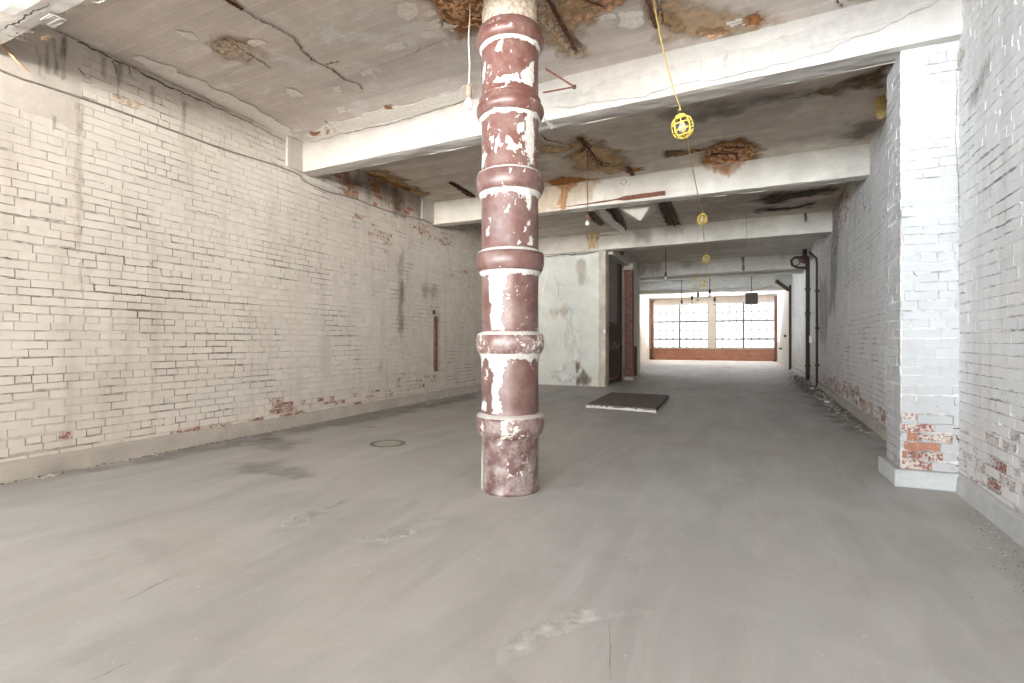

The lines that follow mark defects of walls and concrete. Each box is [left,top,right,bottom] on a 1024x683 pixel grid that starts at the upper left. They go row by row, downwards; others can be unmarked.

crack [0,4,49,31]
crack [58,32,464,144]
crack [242,9,451,90]
spalling [397,0,484,39]
peeling [537,0,937,108]
flaking render [330,171,450,246]
rust [540,136,644,209]
spalling [577,137,635,176]
spalling [706,142,755,164]
flaking render [901,414,953,471]
flaking render [963,430,1024,517]